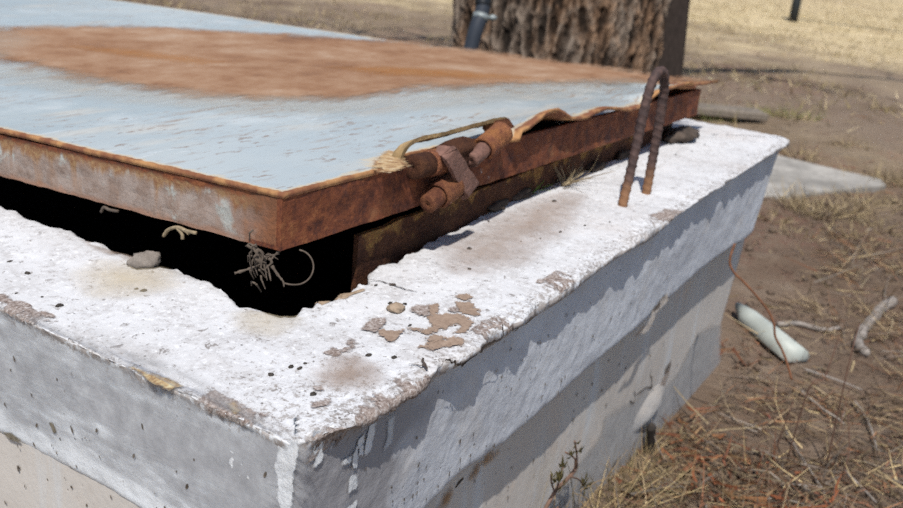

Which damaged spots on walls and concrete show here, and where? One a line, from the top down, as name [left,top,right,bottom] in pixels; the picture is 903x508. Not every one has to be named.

corrosion [0,25,697,101]
corrosion [372,150,410,173]
spalling [315,289,365,305]
peeling [362,293,514,350]
peeling [0,293,431,508]